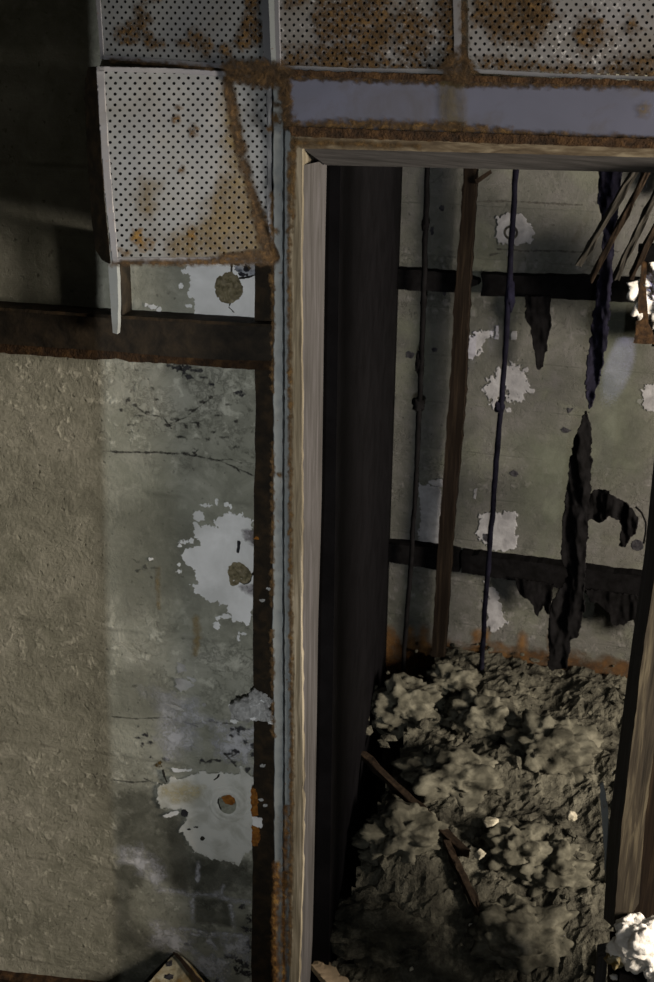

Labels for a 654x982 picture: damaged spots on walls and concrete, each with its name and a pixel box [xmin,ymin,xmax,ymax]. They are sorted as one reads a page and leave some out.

corrosion [109,0,654,394]
spalling [234,263,255,277]
peeling [192,498,232,522]
corrosion [259,138,421,982]
corrosion [385,627,435,687]
peeling [252,816,263,828]
corrosion [250,787,267,846]